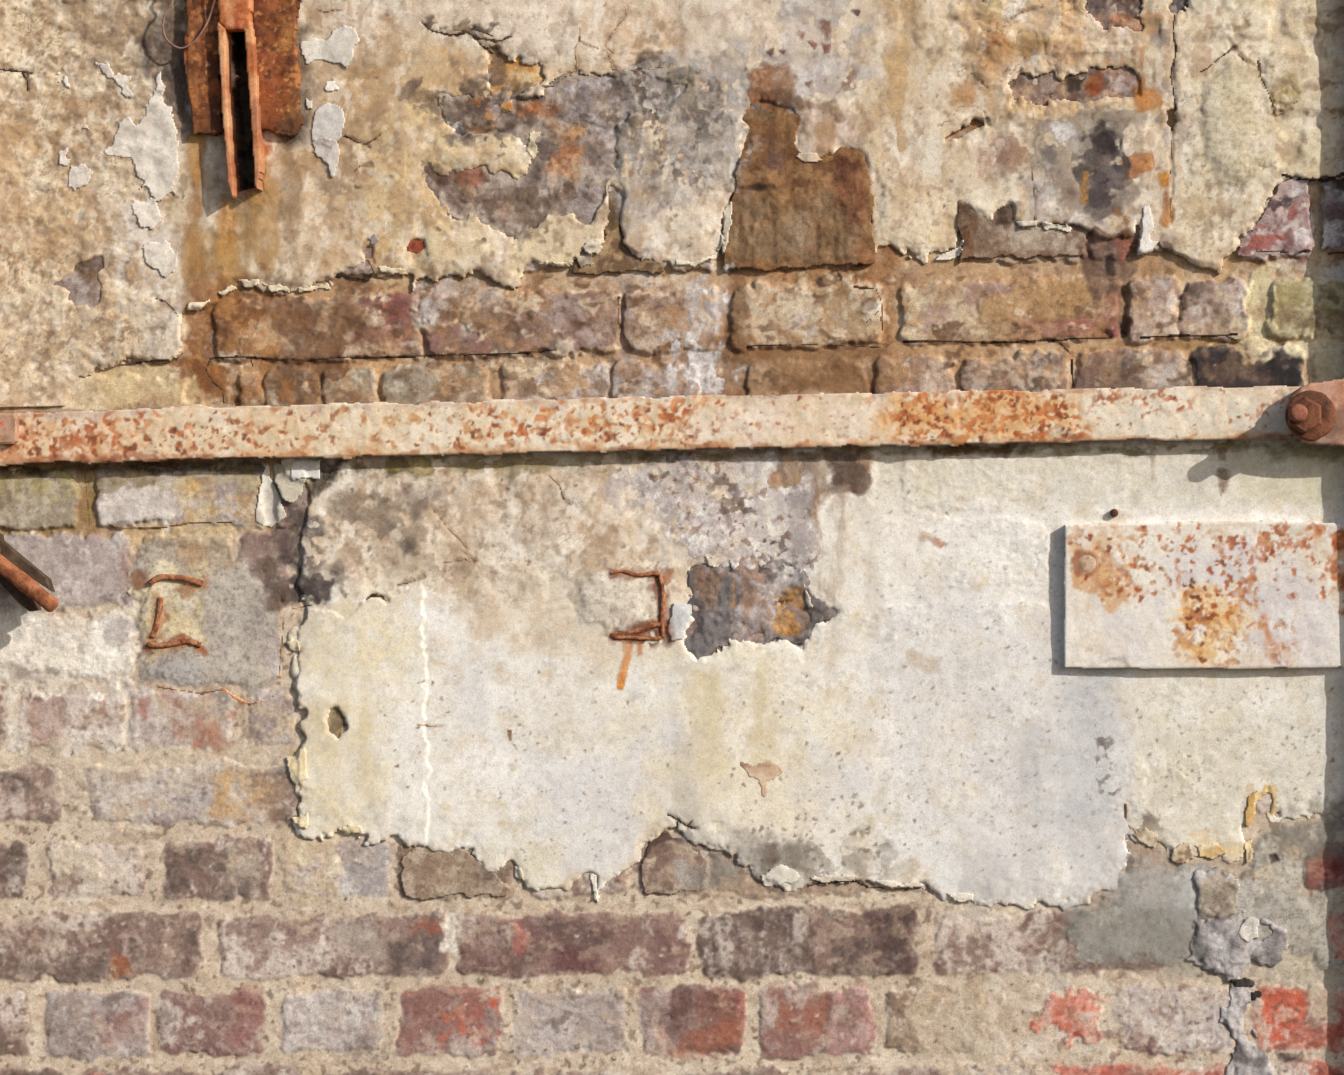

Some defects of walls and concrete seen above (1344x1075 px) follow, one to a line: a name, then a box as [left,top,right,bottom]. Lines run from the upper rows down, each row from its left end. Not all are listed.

spalling [1008,67,1140,105]
peeling [104,72,179,278]
spalling [421,47,876,275]
spalling [935,200,1089,262]
flaking render [1137,205,1173,255]
leakage [181,285,365,404]
peeling [256,459,321,527]
rust [147,598,207,656]
rust [617,569,673,689]
spalling [668,553,837,660]
spalling [759,844,855,887]
spalling [1230,977,1262,1000]